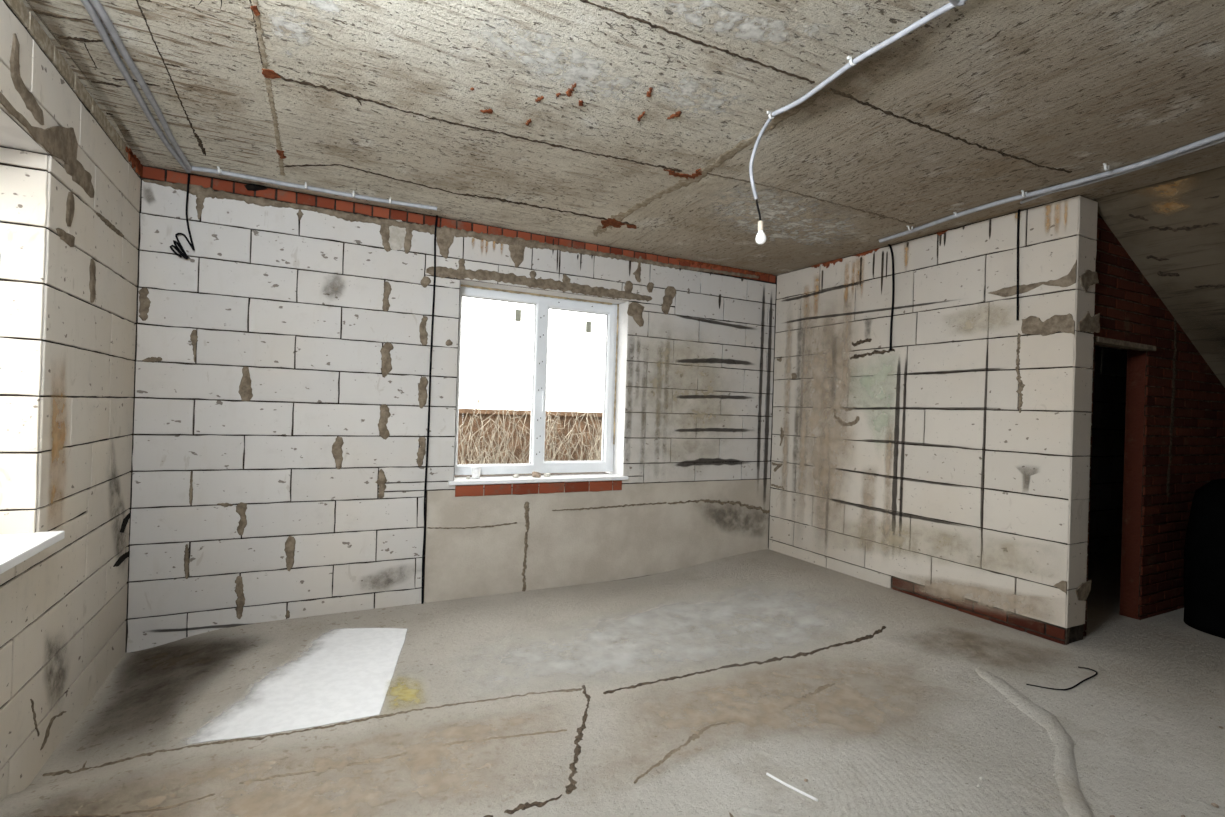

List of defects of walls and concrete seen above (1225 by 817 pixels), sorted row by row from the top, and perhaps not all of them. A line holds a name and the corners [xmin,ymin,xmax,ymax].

leakage [860,251,888,294]
crack [428,290,797,591]
leakage [710,507,761,526]
leakage [782,326,808,491]
crack [155,624,249,632]
crack [30,626,886,817]